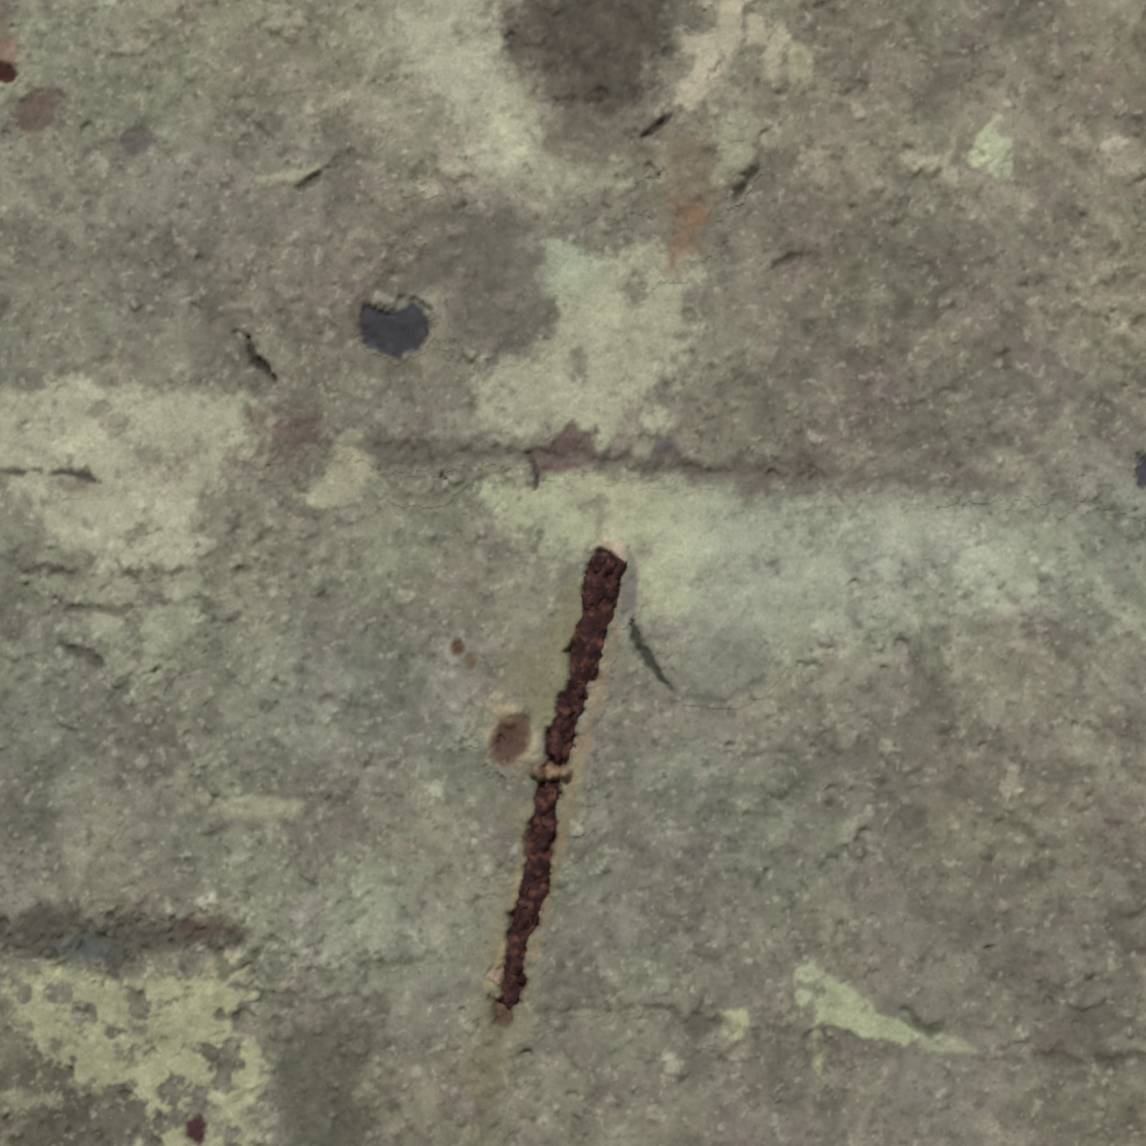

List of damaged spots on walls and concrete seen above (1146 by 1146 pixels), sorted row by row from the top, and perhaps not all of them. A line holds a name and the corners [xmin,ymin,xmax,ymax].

rust [0,0,78,143]
peeling [677,0,818,119]
peeling [368,0,717,453]
water stain [383,0,714,382]
peeling [713,104,767,180]
crack [241,331,279,385]
peeling [286,460,379,516]
crack [220,404,1146,542]
crack [627,613,670,695]
peeling [464,464,959,1034]
rust [436,544,628,1146]